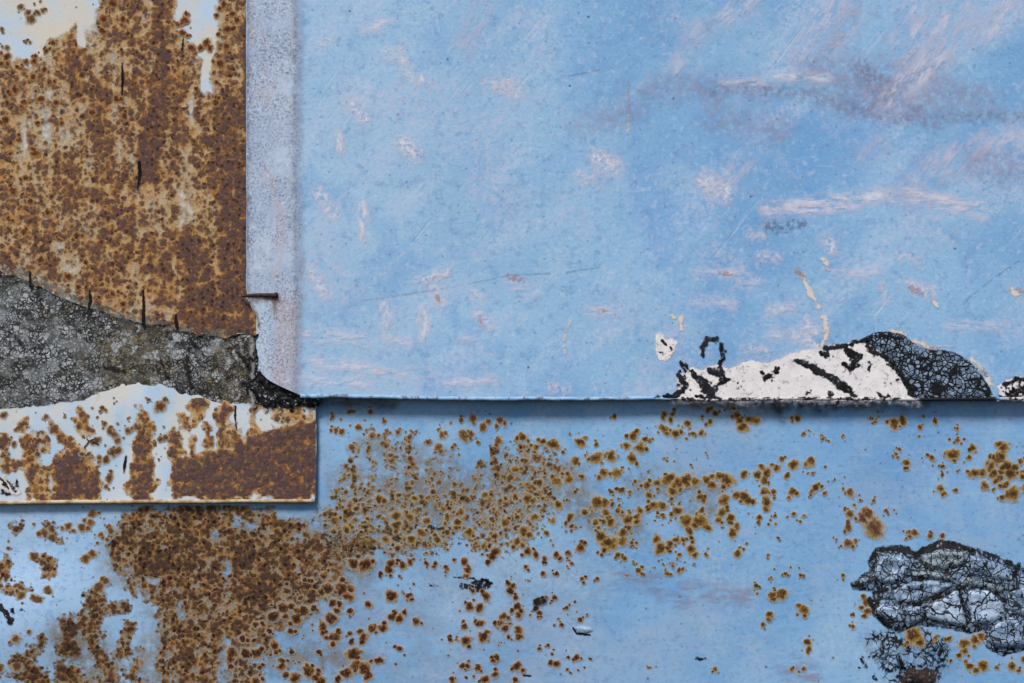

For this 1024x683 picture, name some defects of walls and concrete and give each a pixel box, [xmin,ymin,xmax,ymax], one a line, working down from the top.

rust [0,0,276,338]
peeling [654,314,914,402]
peeling [890,328,949,350]
crack [860,331,994,398]
peeling [969,357,1024,401]
rust [869,410,938,438]
rust [891,423,1024,502]
rust [0,396,897,683]
rust [902,517,945,541]
crack [858,626,949,683]
rust [898,627,1024,676]